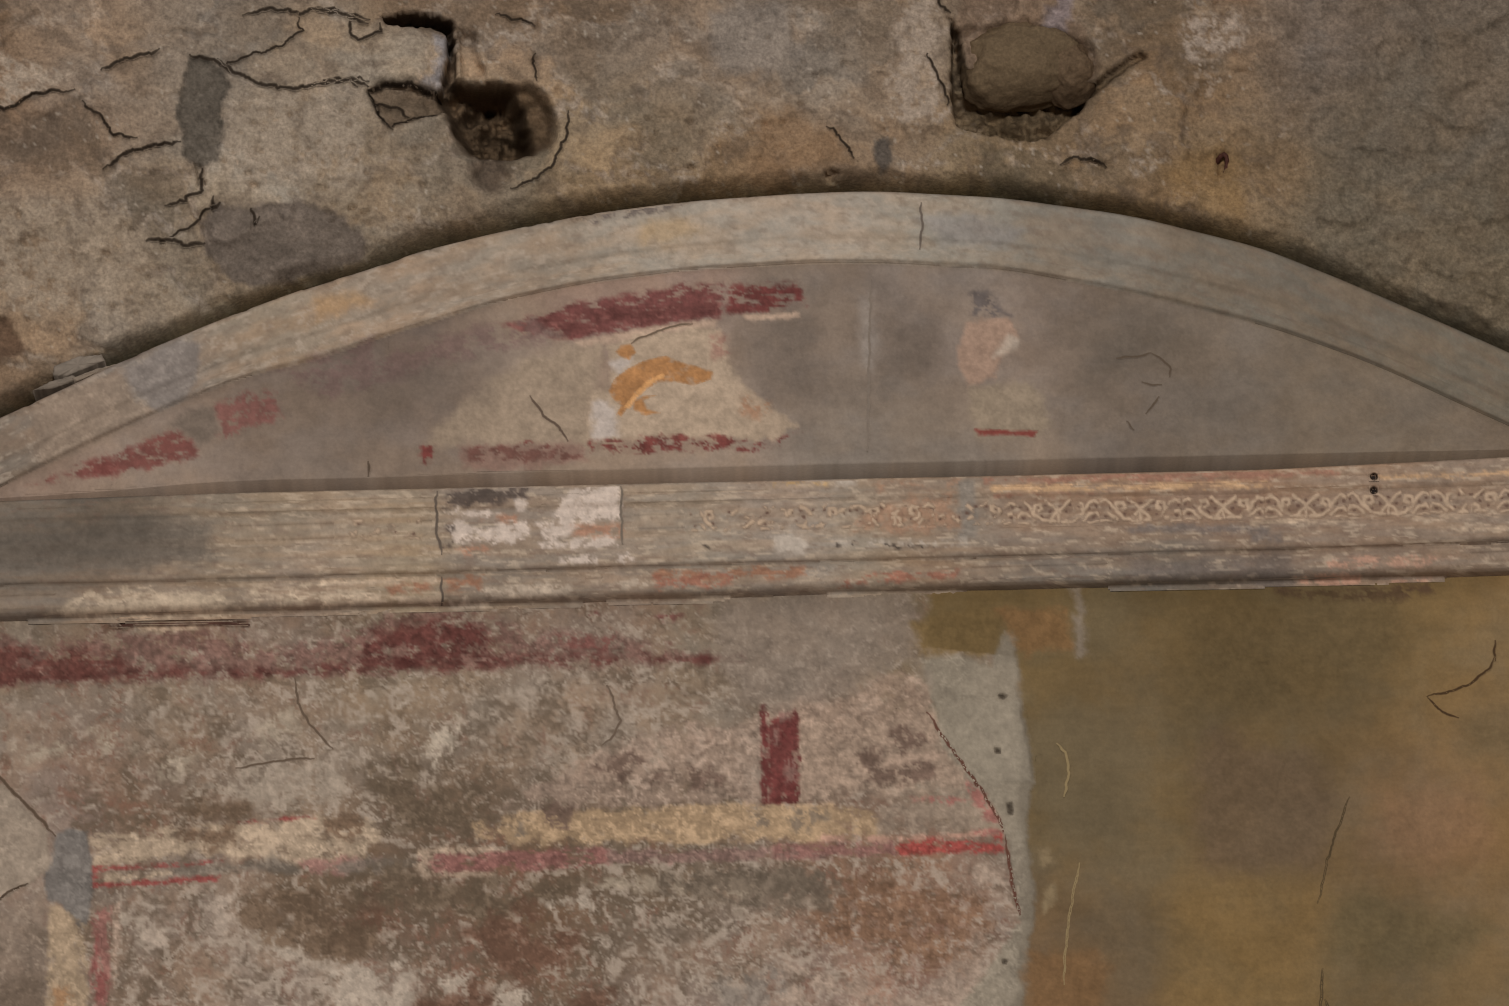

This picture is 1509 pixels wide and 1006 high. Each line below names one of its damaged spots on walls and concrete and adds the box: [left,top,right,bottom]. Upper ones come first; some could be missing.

spalling [870,0,960,147]
crack [0,0,538,248]
crack [510,110,571,190]
peeling [0,486,701,706]
crack [1426,640,1497,719]
crack [0,775,56,837]
crack [926,712,1021,915]
spalling [1005,801,1014,816]
crack [1056,743,1071,797]
crack [0,882,28,901]
crack [1062,862,1080,985]